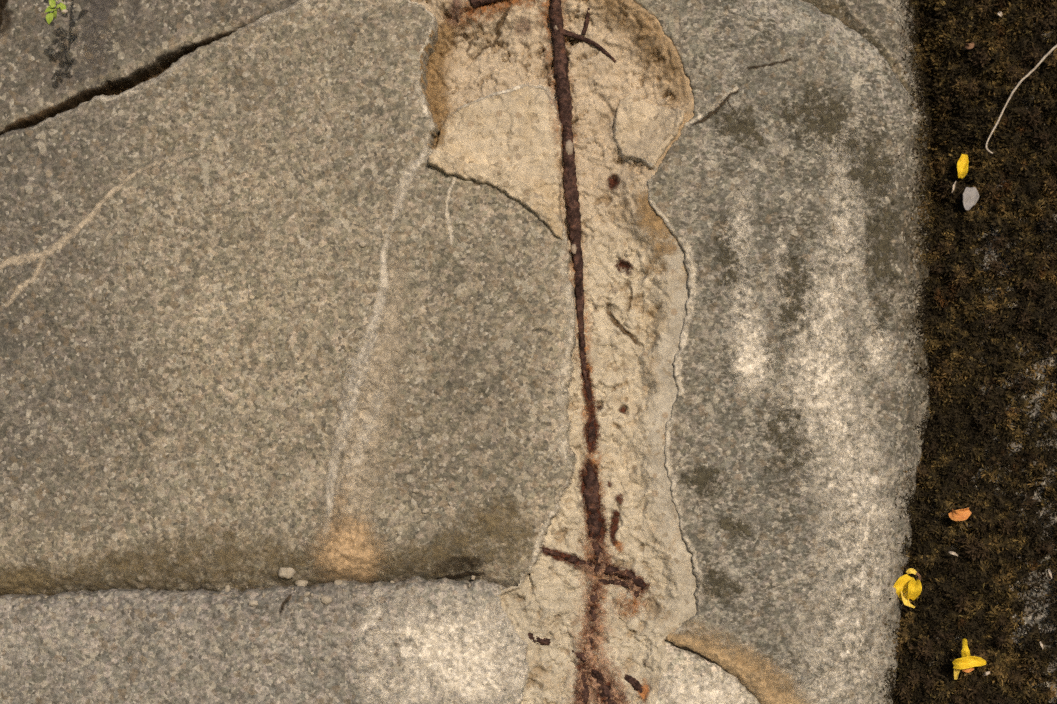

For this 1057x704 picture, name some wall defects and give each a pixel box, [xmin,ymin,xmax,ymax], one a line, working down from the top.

crack [0,0,11,33]
crack [0,31,232,136]
rust [449,0,563,88]
rust [607,175,620,189]
spalling [408,0,704,704]
rust [541,316,650,704]
crack [437,558,485,579]